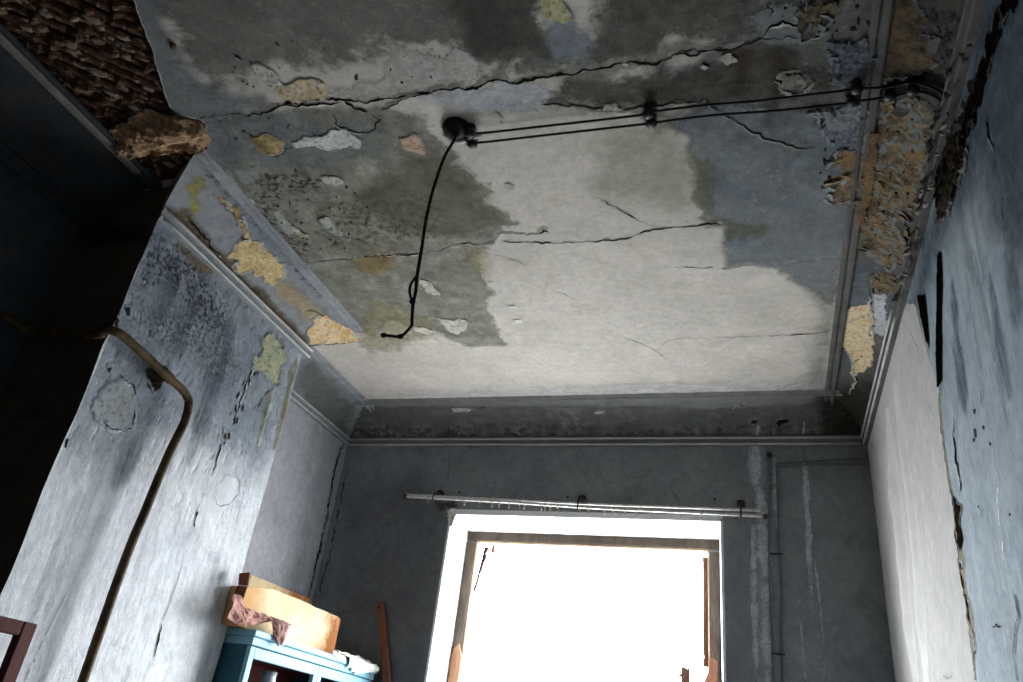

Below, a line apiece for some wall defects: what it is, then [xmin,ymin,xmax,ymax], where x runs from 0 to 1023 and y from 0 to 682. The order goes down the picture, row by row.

peeling [212,194,288,287]
flaking render [250,332,286,387]
peeling [233,115,362,157]
flaking render [306,315,359,346]
leakage [135,0,873,349]
crack [287,196,724,266]
crack [198,4,814,151]
leakage [848,265,898,326]
flaking render [746,0,1005,682]
crack [154,310,361,658]
leakage [67,218,873,682]
crack [938,387,1021,681]